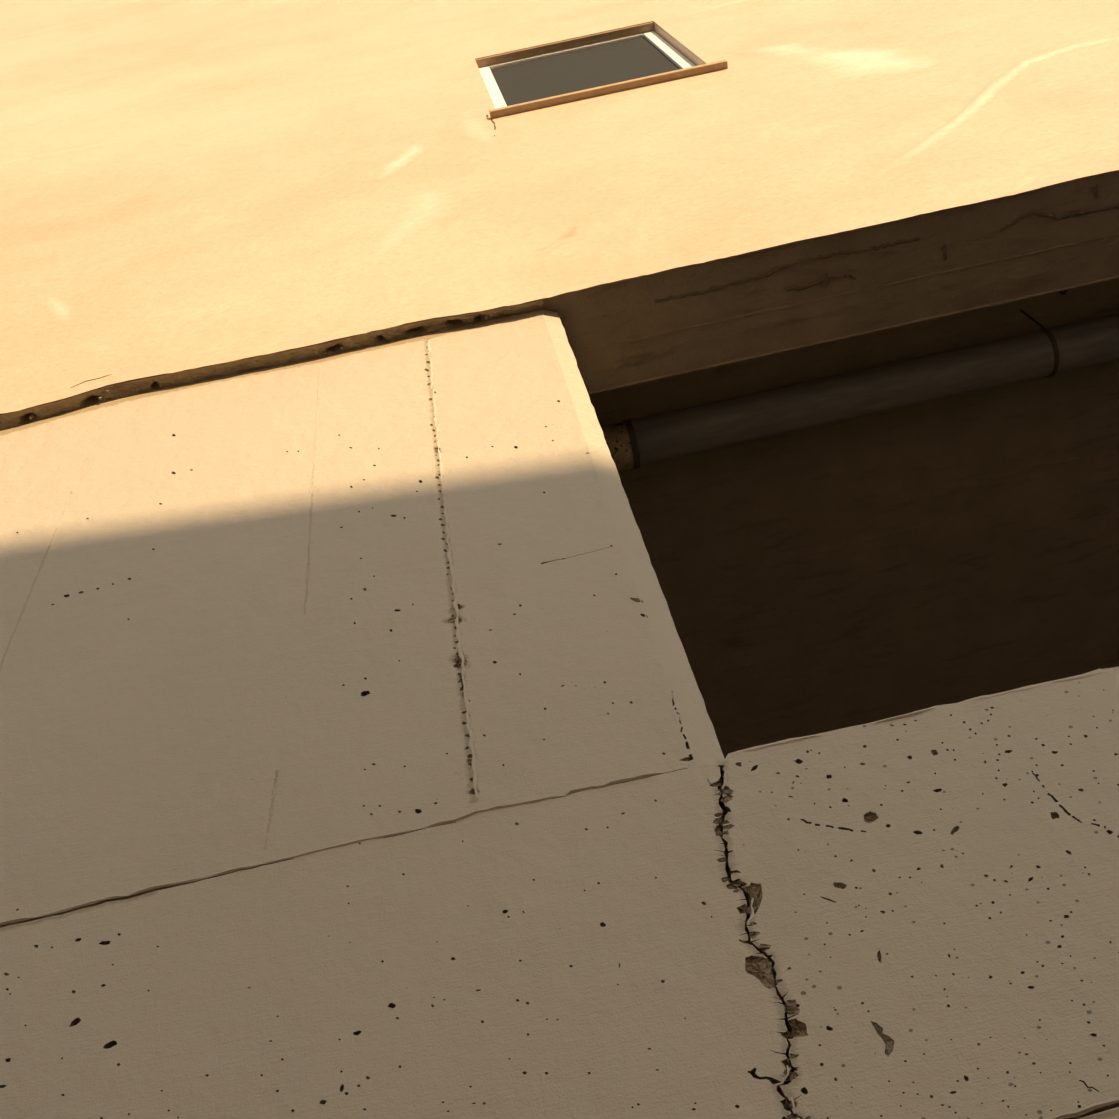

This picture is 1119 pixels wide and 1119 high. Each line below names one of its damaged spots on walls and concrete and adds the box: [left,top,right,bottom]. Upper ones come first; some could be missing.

crack [1000,185,1119,231]
crack [655,237,947,303]
crack [800,819,866,832]
crack [1032,773,1119,838]
crack [0,698,811,1119]
crack [1046,1080,1119,1119]